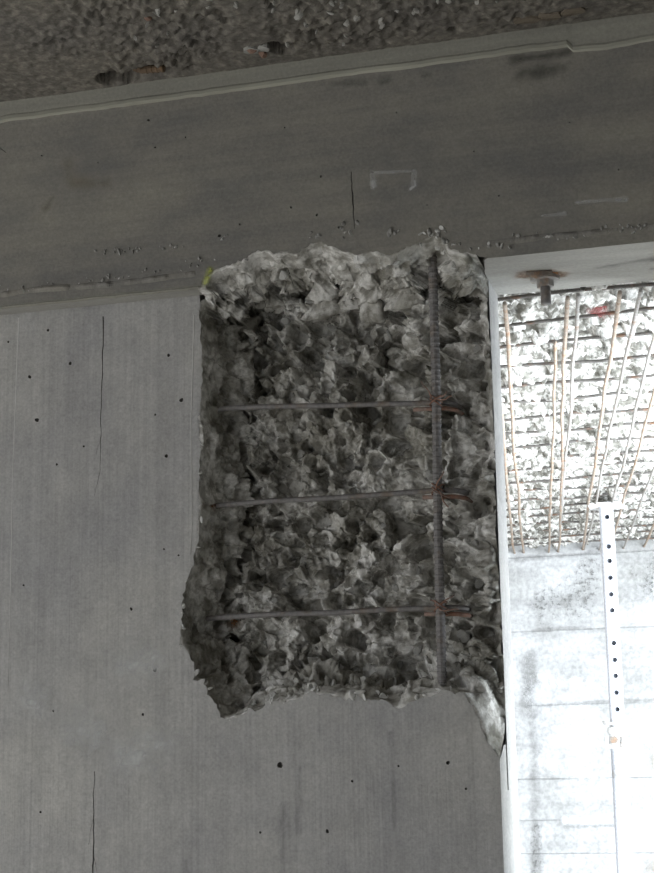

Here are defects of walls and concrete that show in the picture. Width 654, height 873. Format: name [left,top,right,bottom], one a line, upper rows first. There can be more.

crack [94,317,104,496]
spalling [180,236,654,760]
crack [88,772,97,873]